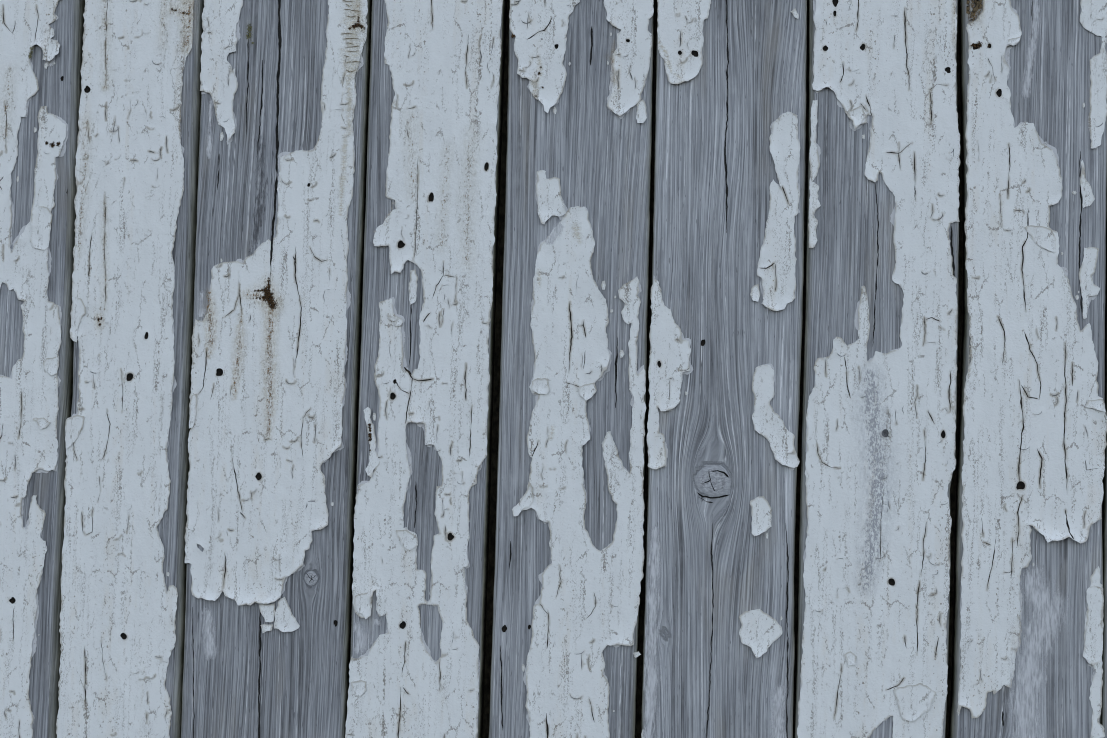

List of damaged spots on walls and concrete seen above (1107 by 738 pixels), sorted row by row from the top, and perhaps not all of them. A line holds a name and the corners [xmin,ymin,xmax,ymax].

peeling [603,0,711,123]
rust [247,277,277,435]
peeling [0,0,580,738]
peeling [512,170,693,738]
peeling [739,609,783,658]
peeling [750,0,1107,738]